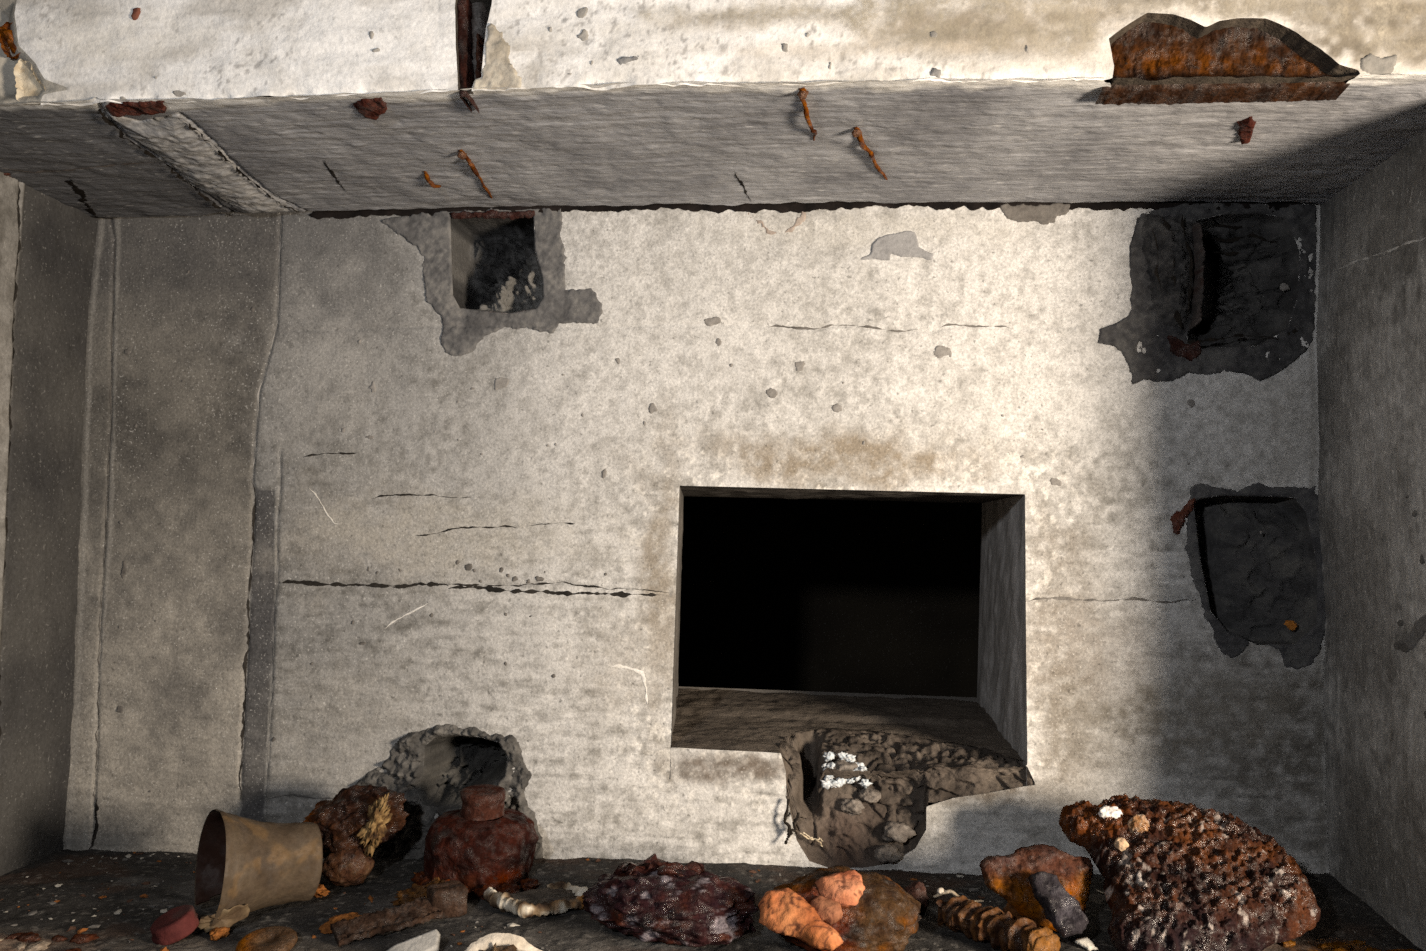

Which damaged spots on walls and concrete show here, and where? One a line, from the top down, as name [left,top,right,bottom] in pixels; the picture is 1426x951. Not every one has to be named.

spalling [381,208,603,356]
spalling [704,317,722,346]
peeling [861,231,933,261]
spalling [933,345,952,358]
spalling [1097,203,1317,384]
crack [239,160,1301,812]
spalling [1170,483,1326,670]
spalling [356,724,544,860]